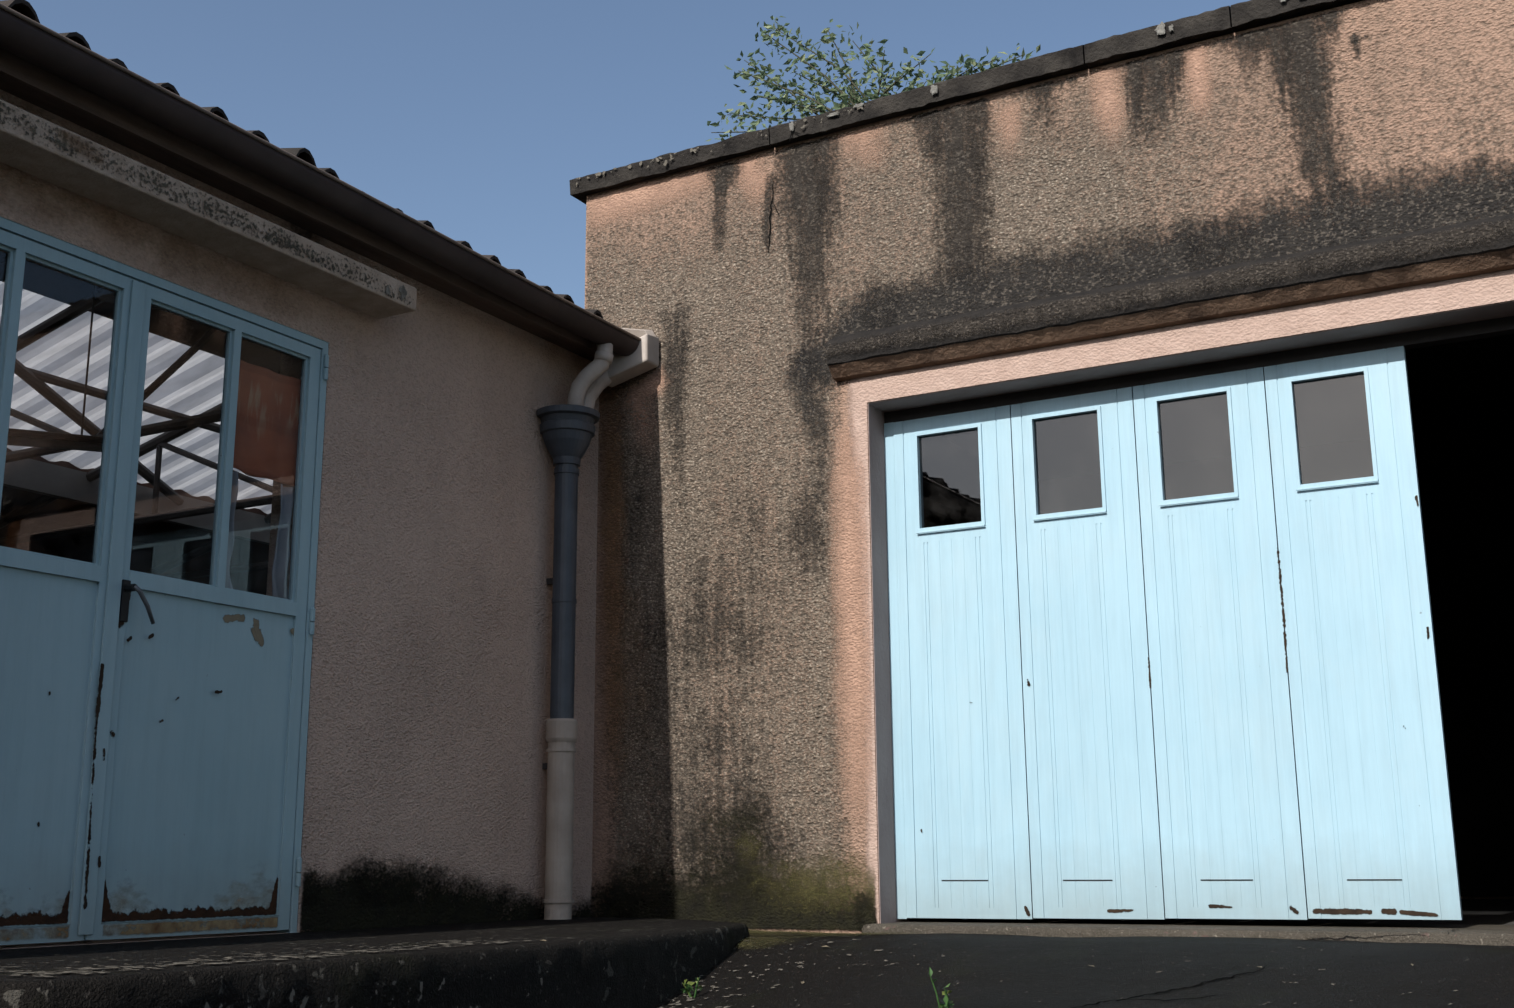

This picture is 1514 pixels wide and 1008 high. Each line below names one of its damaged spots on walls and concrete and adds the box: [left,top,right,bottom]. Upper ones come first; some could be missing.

damp [1440,97,1504,164]
damp [586,10,1425,910]
spalling [223,614,264,646]
spalling [83,663,115,909]
rust [0,890,70,941]
rust [101,878,278,935]